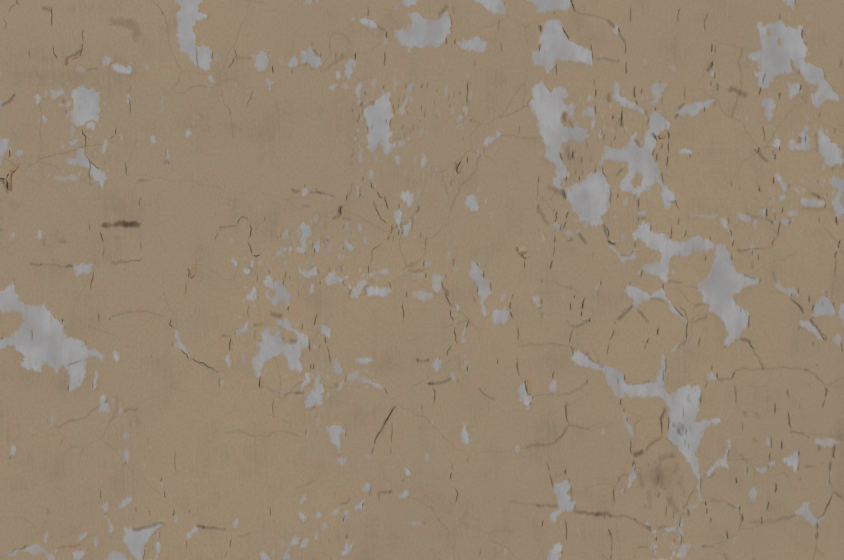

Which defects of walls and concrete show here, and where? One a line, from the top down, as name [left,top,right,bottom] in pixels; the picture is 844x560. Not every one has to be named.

crack [340,167,395,272]
peeling [327,0,490,167]
crack [537,176,581,283]
peeling [526,0,762,351]
peeling [734,0,844,231]
peeling [0,278,126,417]
crack [169,318,225,389]
peeling [223,212,394,469]
crack [569,296,593,350]
crack [363,401,408,462]
peeling [570,348,733,560]
crack [682,465,780,560]